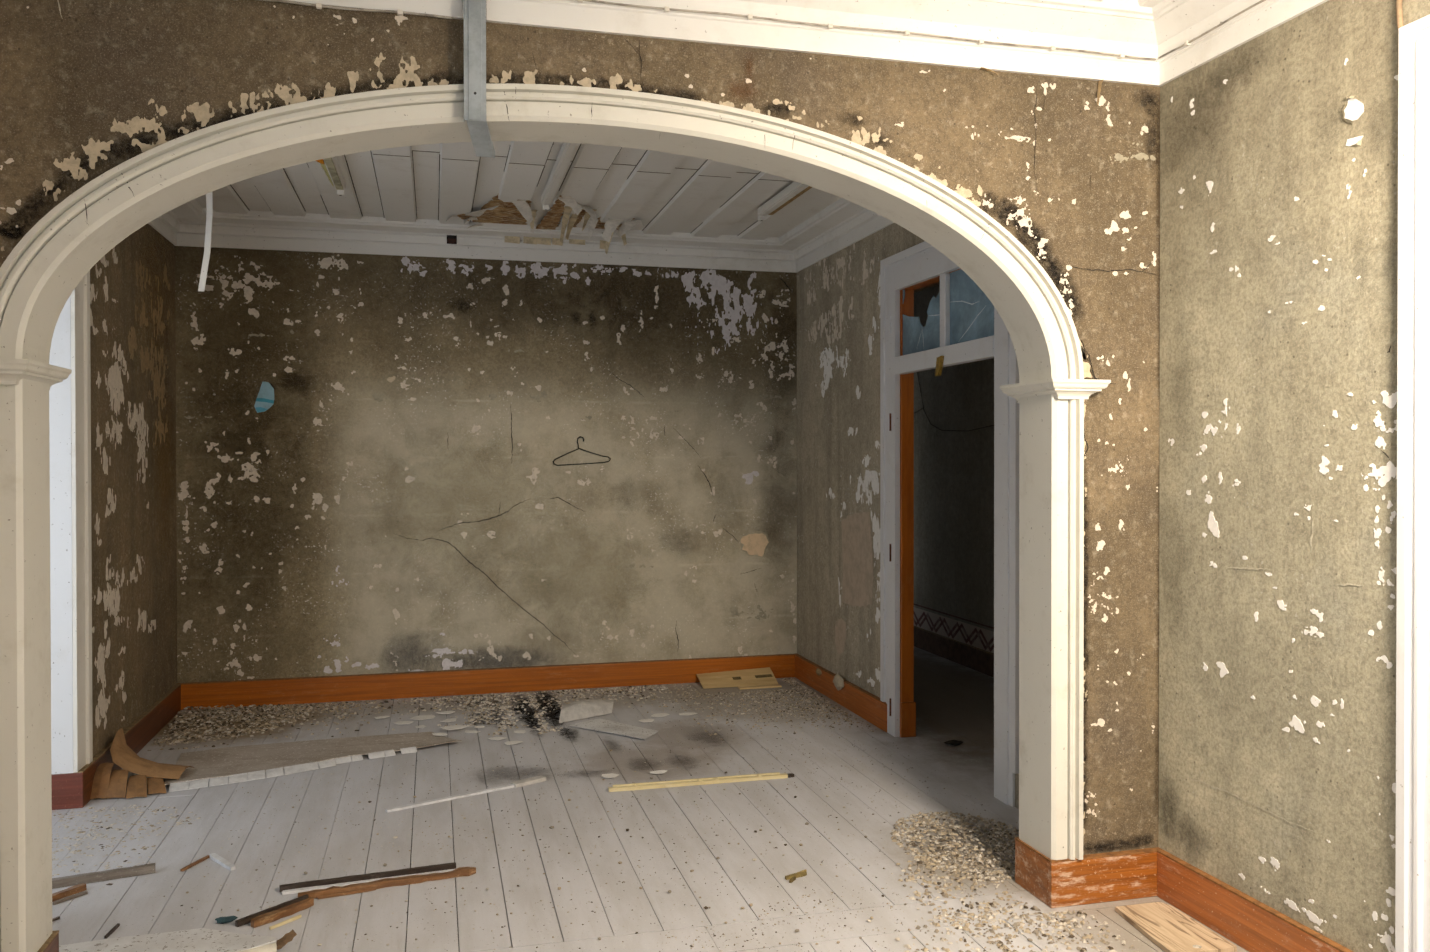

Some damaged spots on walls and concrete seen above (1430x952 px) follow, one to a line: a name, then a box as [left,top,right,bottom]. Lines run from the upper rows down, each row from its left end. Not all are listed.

peeling [42,16,455,201]
peeling [851,116,1076,260]
peeling [965,82,1056,145]
flaking render [1341,95,1367,199]
peeling [194,254,364,379]
peeling [423,259,796,504]
peeling [1059,265,1074,316]
peeling [90,247,170,729]
peeling [178,431,286,679]
crack [393,497,583,655]
peeling [1323,390,1397,549]
peeling [1282,694,1344,744]